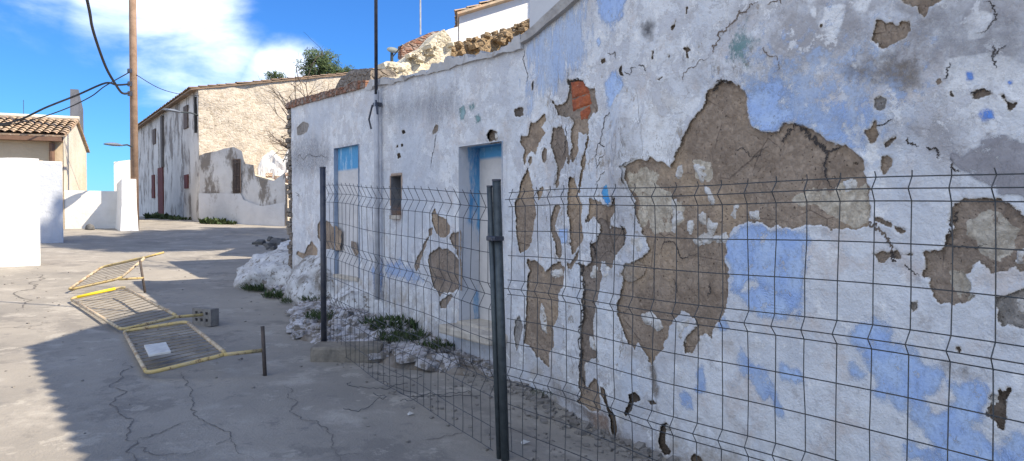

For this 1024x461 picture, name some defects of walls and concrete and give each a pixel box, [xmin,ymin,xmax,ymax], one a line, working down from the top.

crack [682,0,781,80]
flaking render [872,0,941,49]
flaking render [372,209,463,308]
flaking render [514,0,906,435]
flaking render [874,135,1024,305]
flaking render [996,288,1024,329]
crack [109,363,253,461]
peeling [849,318,1024,461]